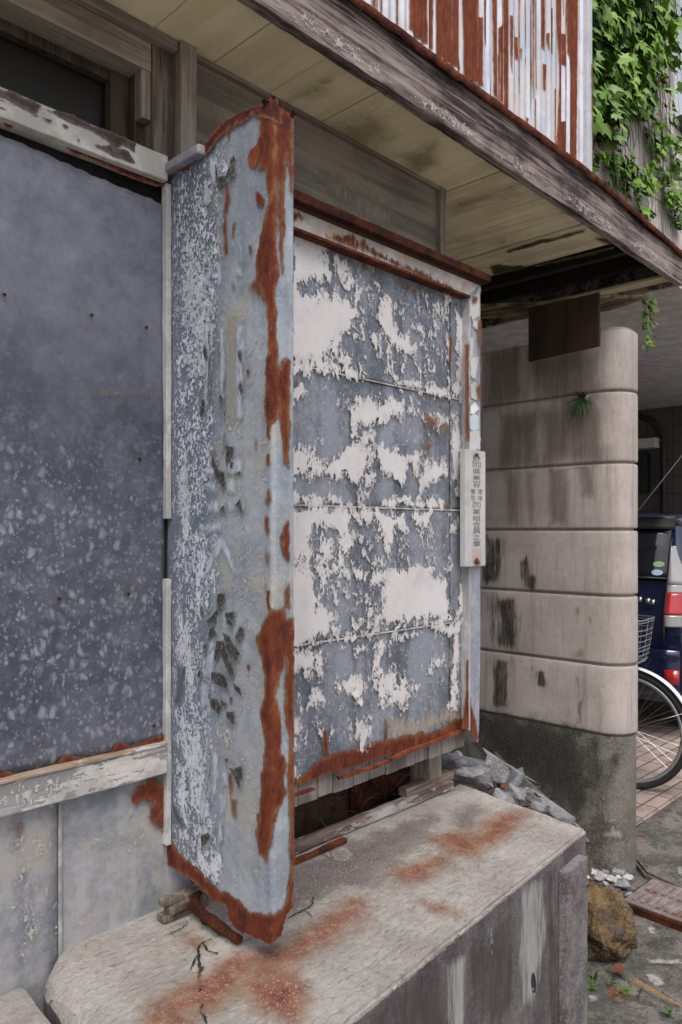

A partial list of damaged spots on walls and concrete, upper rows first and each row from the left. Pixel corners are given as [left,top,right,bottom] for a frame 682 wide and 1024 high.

rust [396,0,578,159]
peeling [0,89,136,163]
peeling [170,133,274,889]
rust [264,488,290,562]
peeling [293,237,481,778]
damp [483,538,501,584]
damp [521,555,535,590]
damp [487,598,518,648]
peeling [1,766,101,821]
rust [132,584,478,1024]
rust [395,811,525,882]
crack [168,920,233,1024]